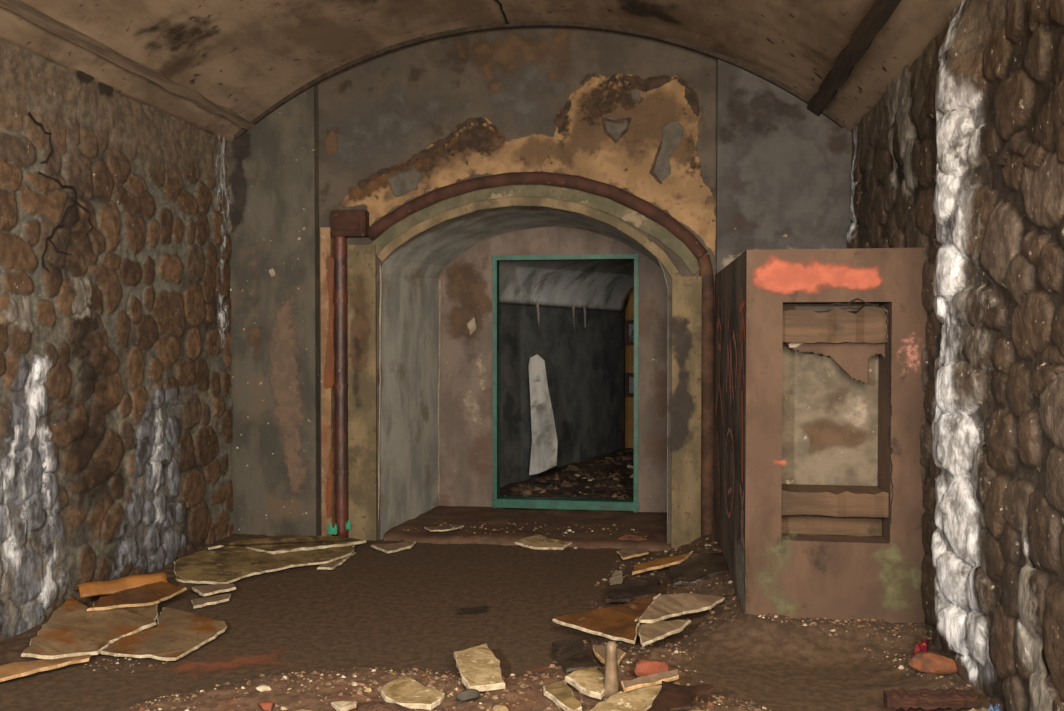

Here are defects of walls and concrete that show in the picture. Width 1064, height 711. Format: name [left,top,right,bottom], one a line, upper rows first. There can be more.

peeling [339,74,741,269]
damp [6,293,34,332]
damp [57,186,105,392]
damp [931,0,996,681]
damp [0,354,72,637]
damp [73,387,186,580]